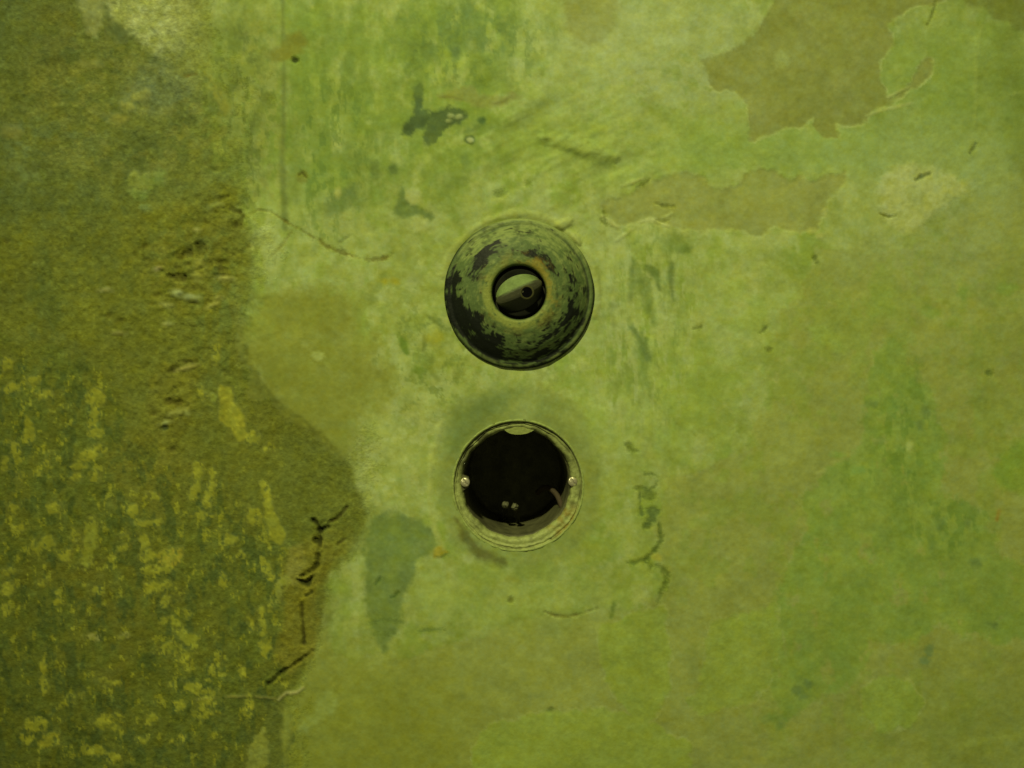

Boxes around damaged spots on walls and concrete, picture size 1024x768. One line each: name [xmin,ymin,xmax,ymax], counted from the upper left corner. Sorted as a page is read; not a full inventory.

damp [251,53,305,233]
peeling [699,0,947,144]
crack [194,504,349,703]
crack [624,471,673,605]